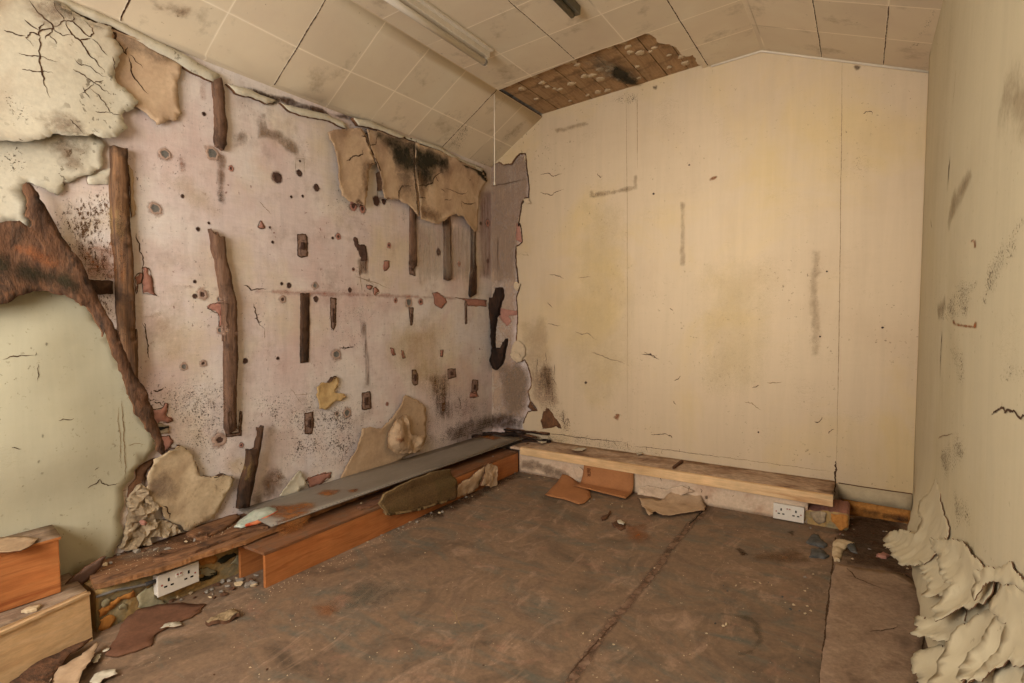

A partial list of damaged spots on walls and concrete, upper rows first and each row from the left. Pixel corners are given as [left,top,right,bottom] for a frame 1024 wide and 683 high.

crack [4,0,147,133]
water stain [596,59,638,104]
spalling [349,196,390,213]
water stain [378,133,448,217]
spalling [135,267,157,296]
spalling [192,280,229,334]
peeling [394,153,538,459]
water stain [425,151,659,455]
peeling [117,403,235,551]
peeling [279,395,427,496]
crack [991,406,1024,420]
peeling [883,479,1024,683]